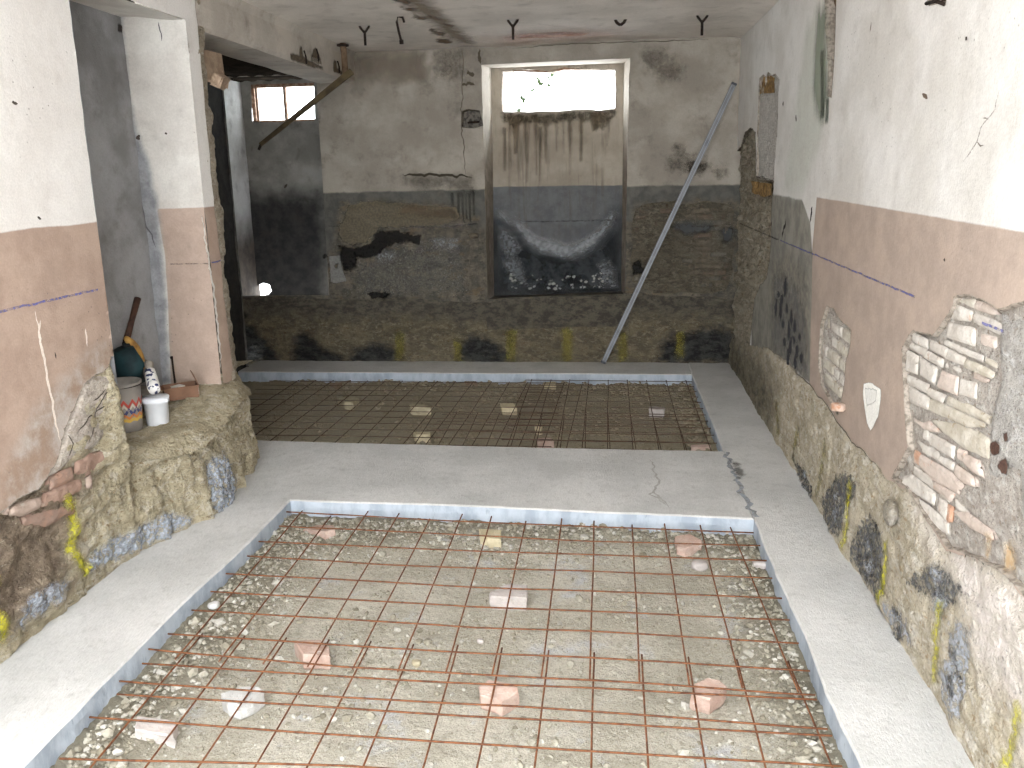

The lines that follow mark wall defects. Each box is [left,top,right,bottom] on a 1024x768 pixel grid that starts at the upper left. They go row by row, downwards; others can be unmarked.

water stain [503,110,615,162]
flaking render [338,200,460,246]
flaking render [818,305,851,417]
flaking render [0,356,112,540]
crack [648,459,672,509]
flaking render [891,294,1024,596]